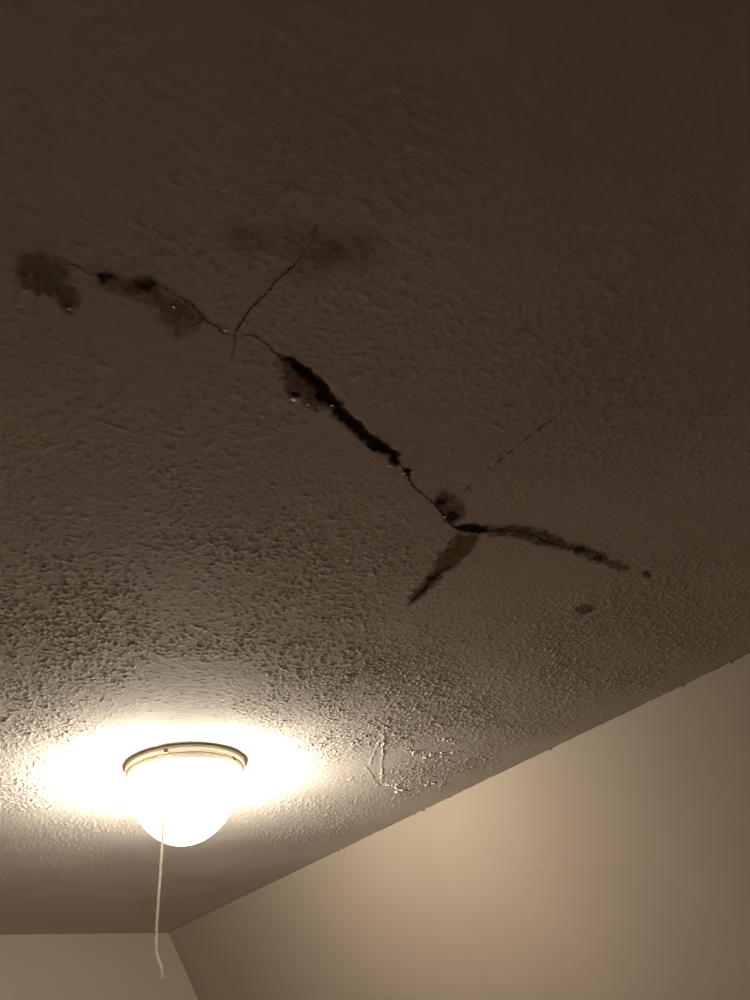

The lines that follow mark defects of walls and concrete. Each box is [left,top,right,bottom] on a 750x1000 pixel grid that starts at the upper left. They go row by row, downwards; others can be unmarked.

crack [63,225,651,578]
crack [407,567,451,606]